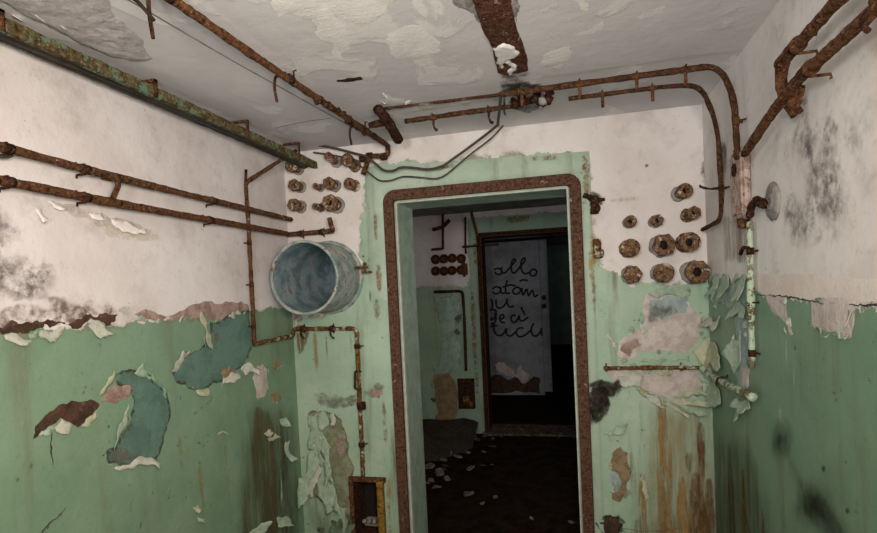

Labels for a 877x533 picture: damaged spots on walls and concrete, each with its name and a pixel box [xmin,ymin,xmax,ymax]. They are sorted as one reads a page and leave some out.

peeling [270,0,395,60]
peeling [35,200,147,235]
water stain [813,164,838,216]
peeling [0,313,118,346]
peeling [134,301,283,404]
peeling [604,273,750,422]
peeling [761,293,793,335]
peeling [811,297,855,339]
peeling [33,362,171,471]
peeling [264,409,355,533]
rust [658,408,715,533]
peeling [250,516,294,533]